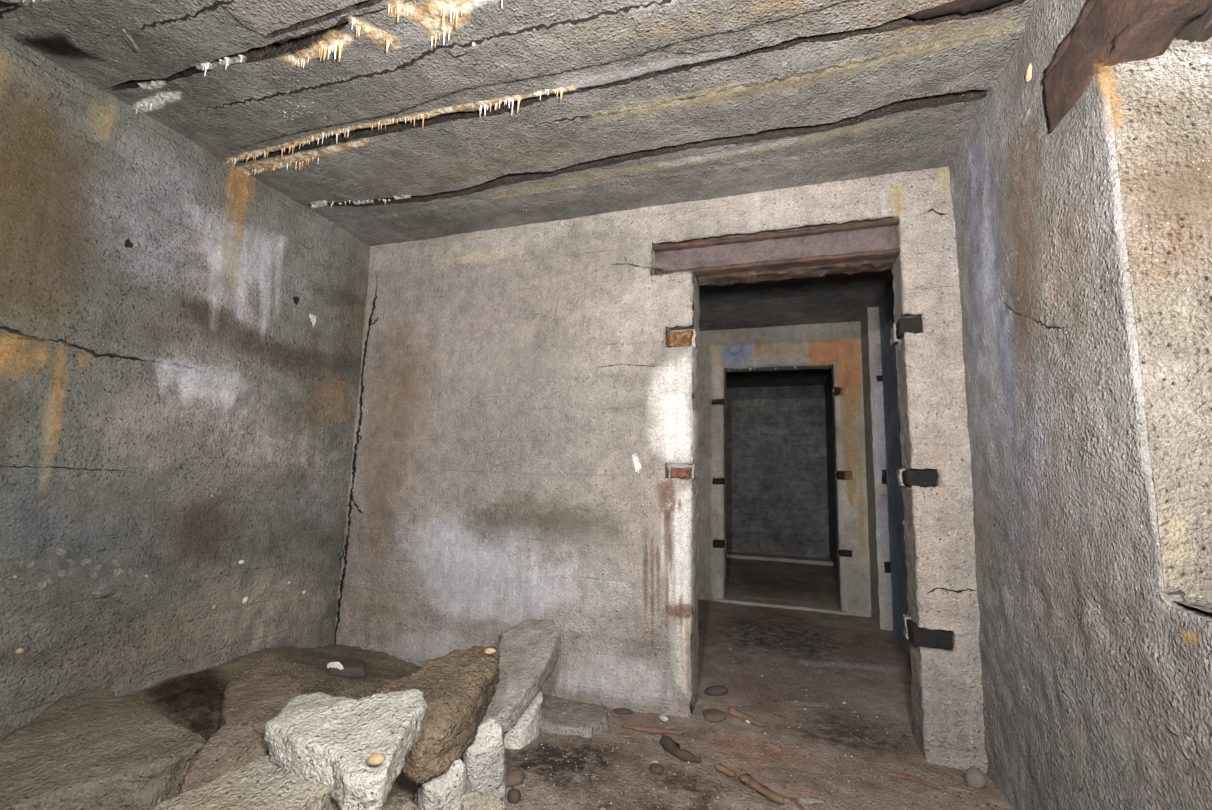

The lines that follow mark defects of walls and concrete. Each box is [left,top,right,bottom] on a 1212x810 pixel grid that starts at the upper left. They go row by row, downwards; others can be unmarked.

crack [0,0,29,18]
crack [111,0,413,91]
crack [184,0,1026,163]
crack [308,90,988,207]
crack [0,326,208,373]
crack [335,270,379,644]
rust [645,482,691,630]